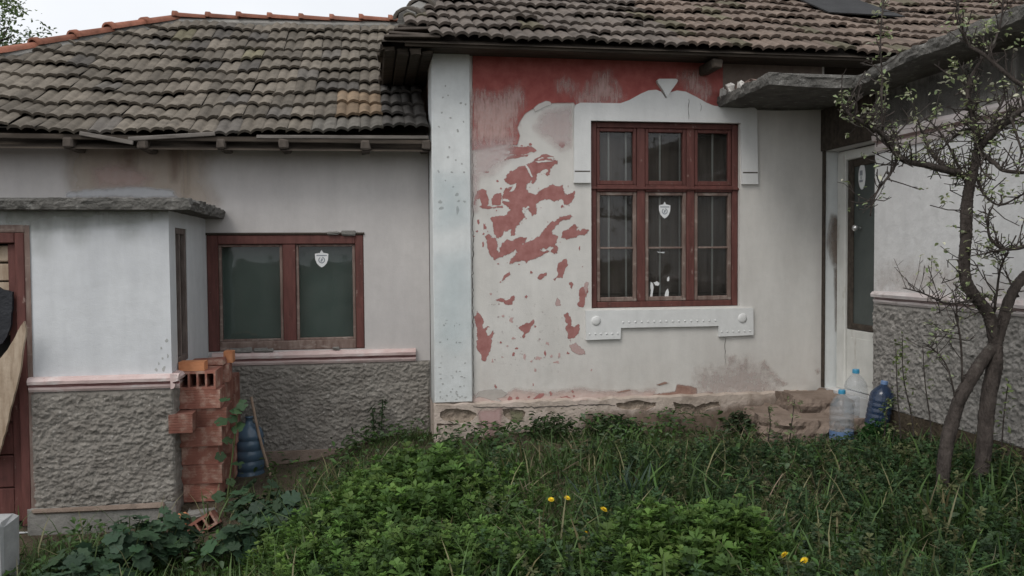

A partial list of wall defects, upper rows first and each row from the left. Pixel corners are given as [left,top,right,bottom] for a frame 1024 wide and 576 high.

peeling [437,56,822,386]
flaking render [437,357,525,438]
flaking render [616,382,719,416]
leakage [584,358,785,435]